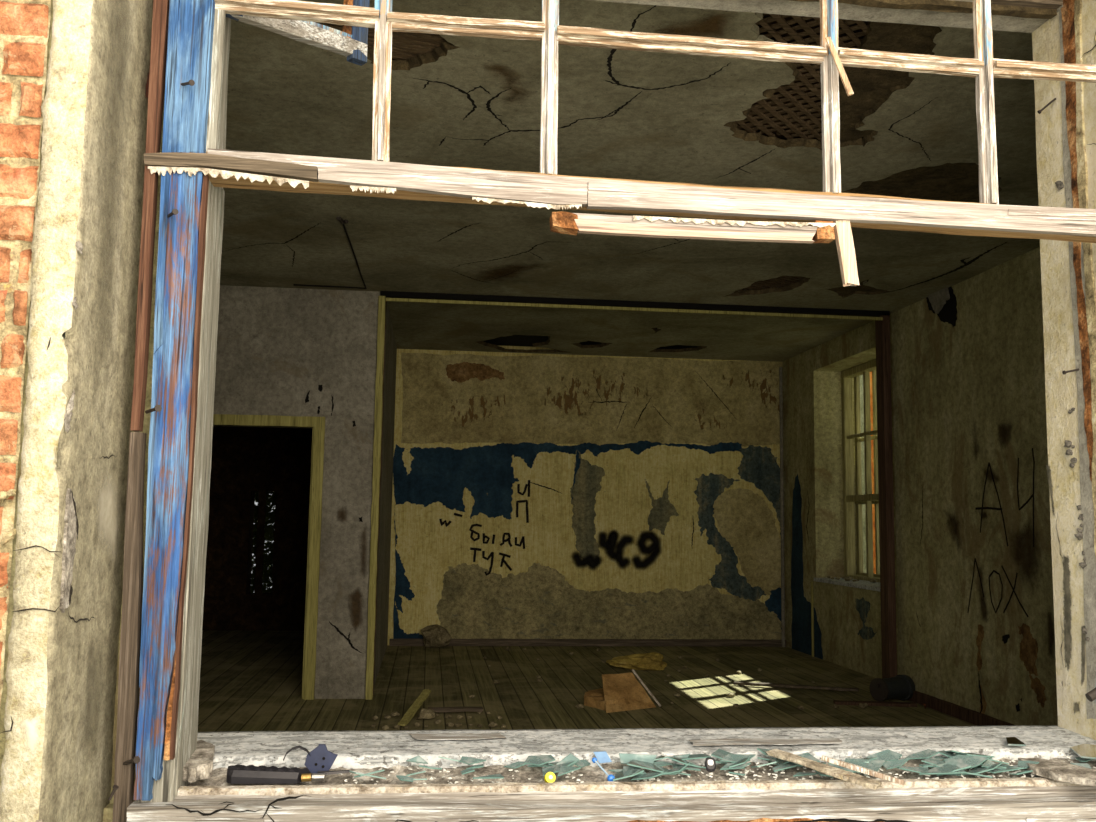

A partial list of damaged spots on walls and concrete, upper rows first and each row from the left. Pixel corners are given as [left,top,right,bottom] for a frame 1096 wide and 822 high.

crack [414,5,730,146]
flaking render [393,352,823,659]